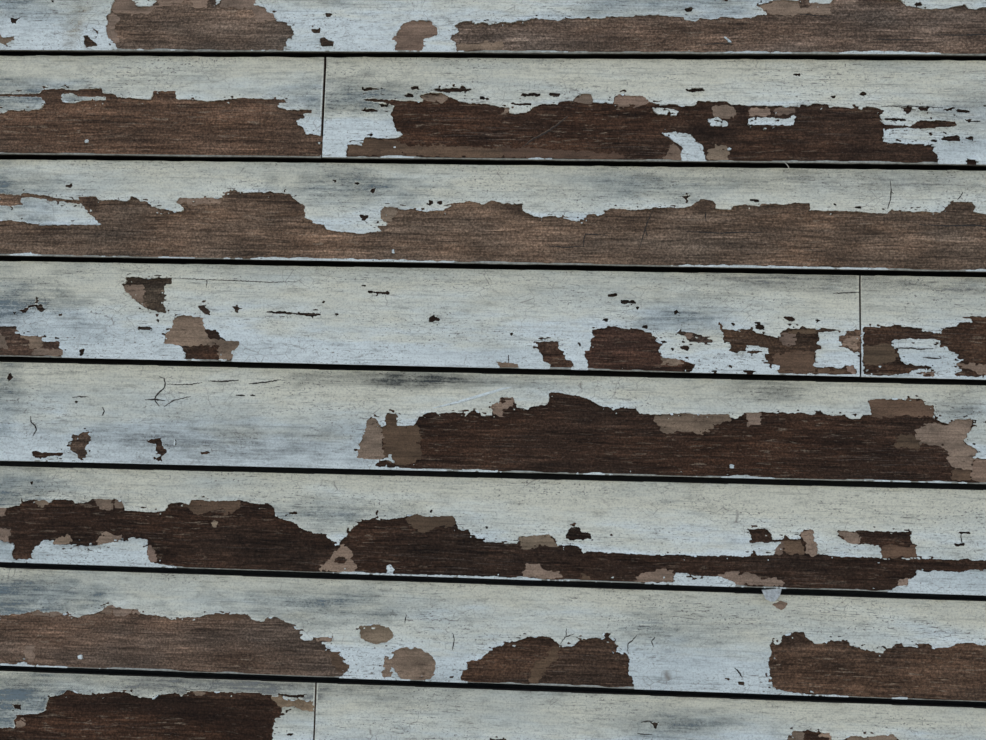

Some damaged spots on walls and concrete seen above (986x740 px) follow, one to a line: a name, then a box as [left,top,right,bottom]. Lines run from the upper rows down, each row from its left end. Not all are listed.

peeling [84,0,294,50]
peeling [450,0,986,54]
peeling [0,88,323,156]
peeling [346,86,980,163]
peeling [0,183,986,270]
peeling [578,316,986,377]
peeling [357,392,986,483]
peeling [0,498,986,610]
peeling [0,605,349,677]
peeling [450,633,634,687]
peeling [768,632,986,701]
peeling [0,690,315,740]